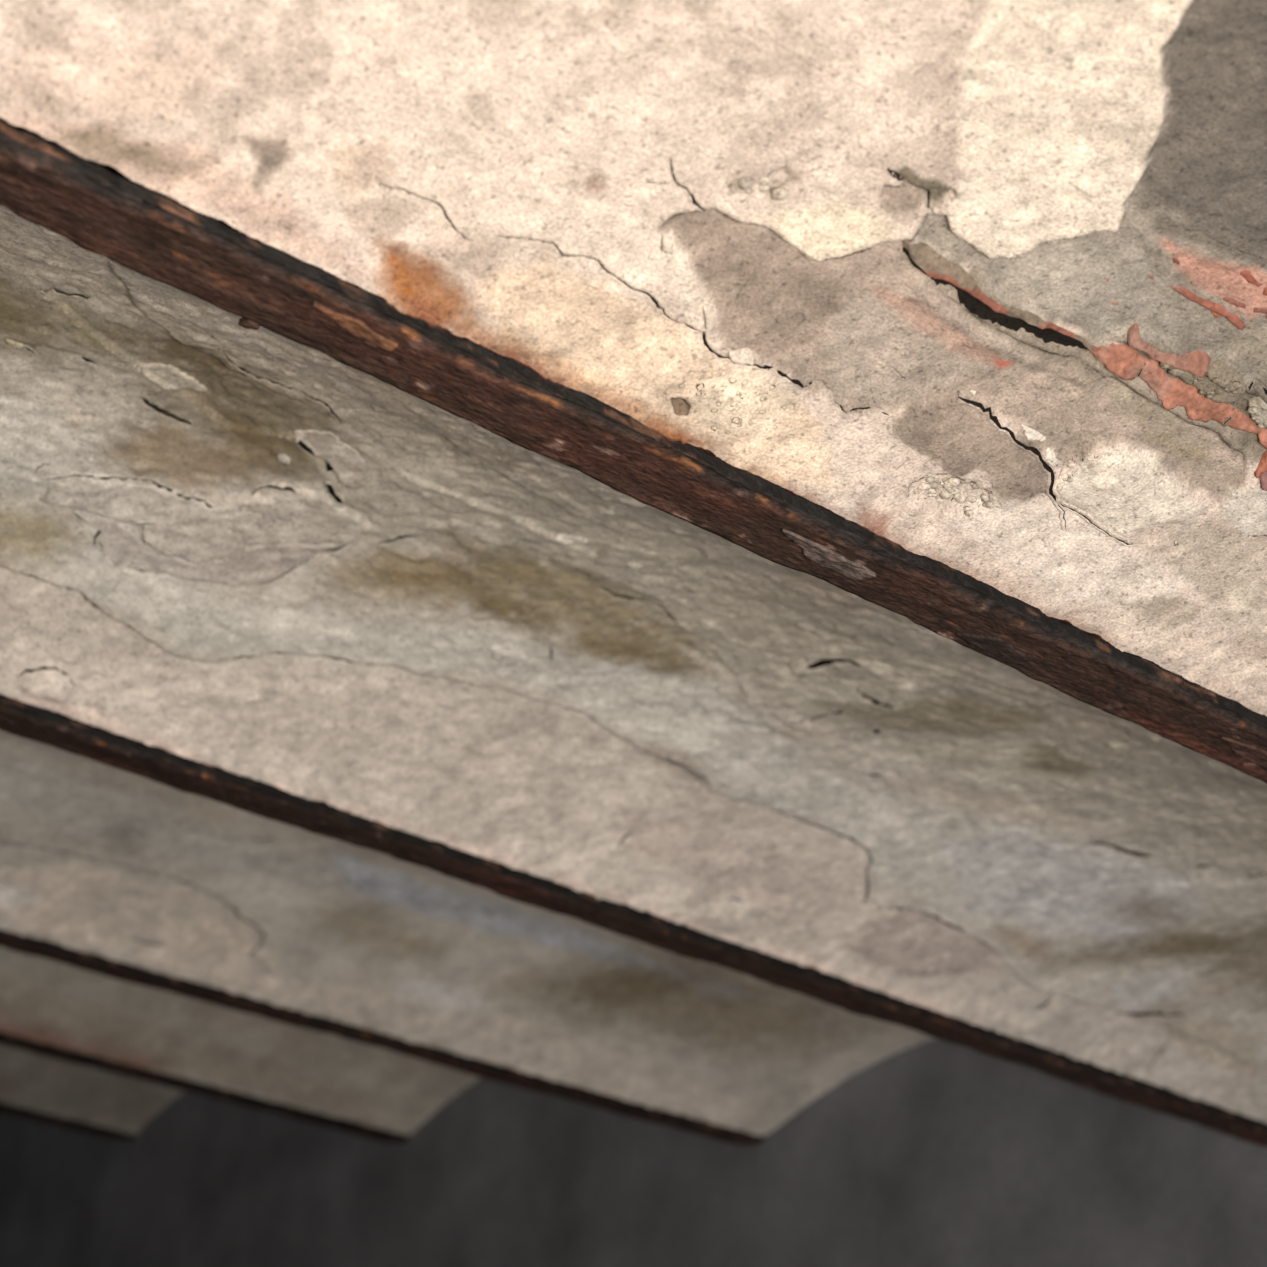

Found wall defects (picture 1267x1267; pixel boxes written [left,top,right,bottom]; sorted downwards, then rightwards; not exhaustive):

crack [645,157,814,261]
spalling [661,0,1267,504]
crack [41,286,93,300]
corrosion [391,256,457,324]
crack [378,181,890,418]
crack [81,356,97,365]
crack [141,396,193,427]
water stain [152,340,326,463]
spalling [909,473,995,518]
crack [957,389,1134,546]
crack [258,533,421,586]
crack [597,583,679,625]